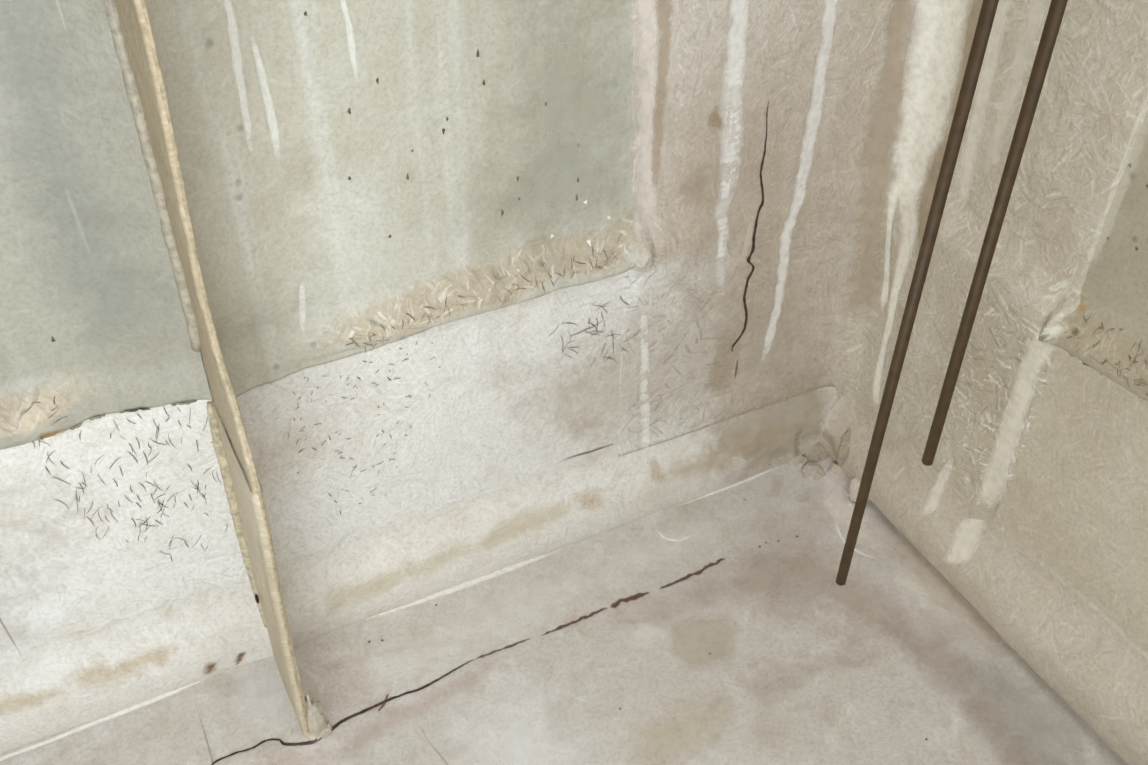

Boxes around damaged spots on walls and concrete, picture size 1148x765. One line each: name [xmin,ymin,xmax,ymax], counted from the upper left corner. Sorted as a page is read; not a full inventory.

damp [716,0,746,276]
crack [732,101,769,378]
damp [766,0,836,346]
crack [211,558,724,765]